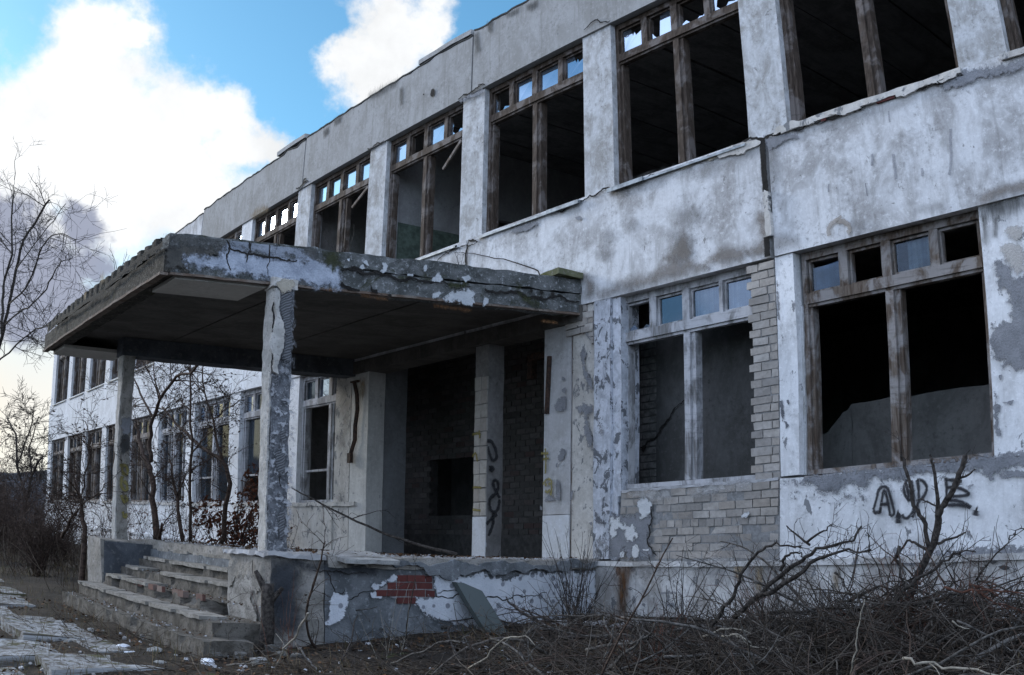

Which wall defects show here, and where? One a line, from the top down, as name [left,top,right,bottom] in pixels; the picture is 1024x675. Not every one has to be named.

peeling [894,59,1024,98]
crack [226,240,297,278]
peeling [407,264,489,306]
damp [583,213,766,297]
peeling [989,225,1024,380]
peeling [183,241,392,548]
peeling [554,376,604,451]
peeling [993,393,1014,436]
peeling [784,450,1024,502]
peeling [370,496,656,629]
peeling [325,592,349,625]